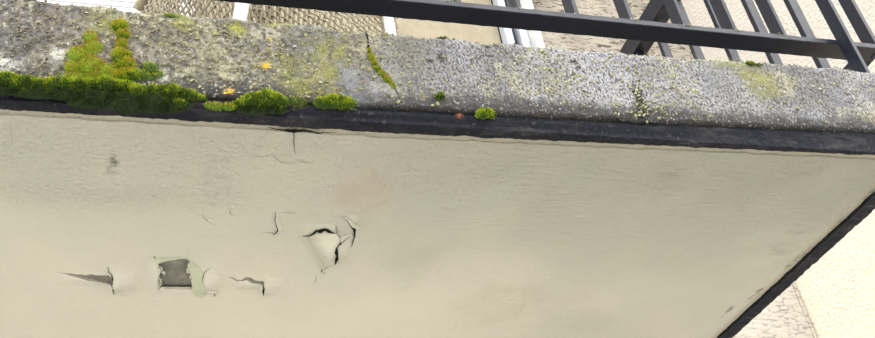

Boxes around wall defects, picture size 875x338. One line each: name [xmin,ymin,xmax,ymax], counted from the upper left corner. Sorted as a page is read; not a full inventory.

crack [251,127,335,164]
peeling [51,214,370,300]